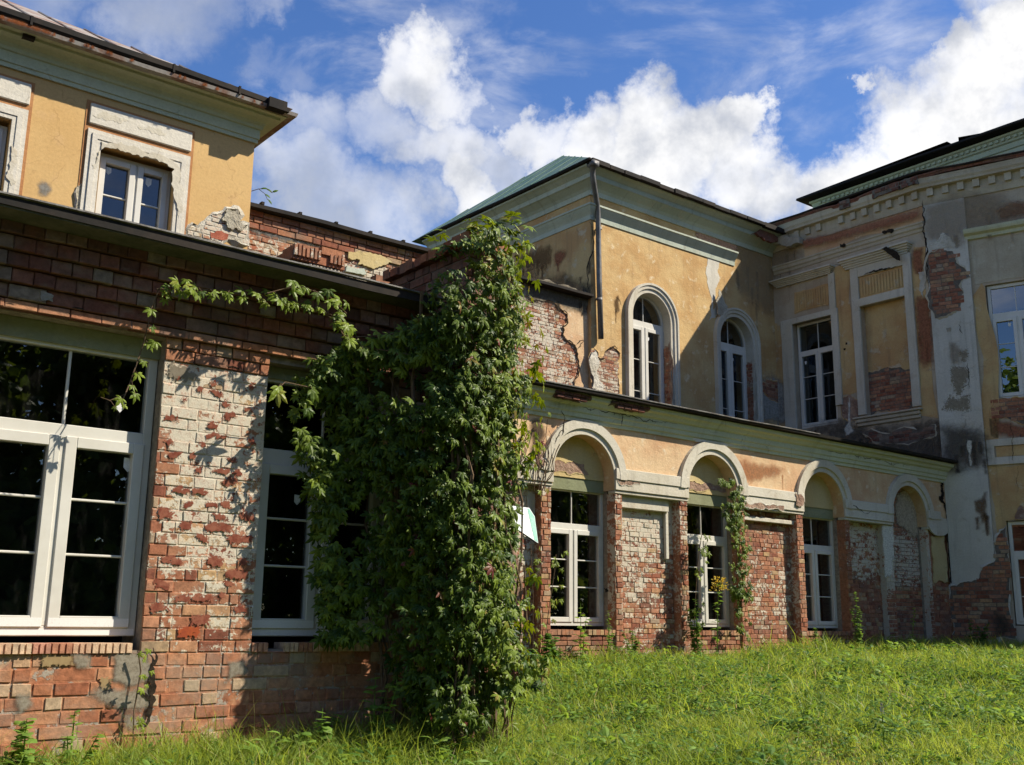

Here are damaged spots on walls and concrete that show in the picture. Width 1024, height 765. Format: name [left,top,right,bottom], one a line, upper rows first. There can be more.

spalling [185,205,250,247]
crack [921,201,929,285]
spalling [912,248,971,362]
peeling [164,361,254,488]
spalling [552,342,675,413]
spalling [840,366,914,422]
spalling [989,396,1024,445]
peeling [158,485,256,545]
peeling [150,555,249,639]
spalling [948,505,1024,643]